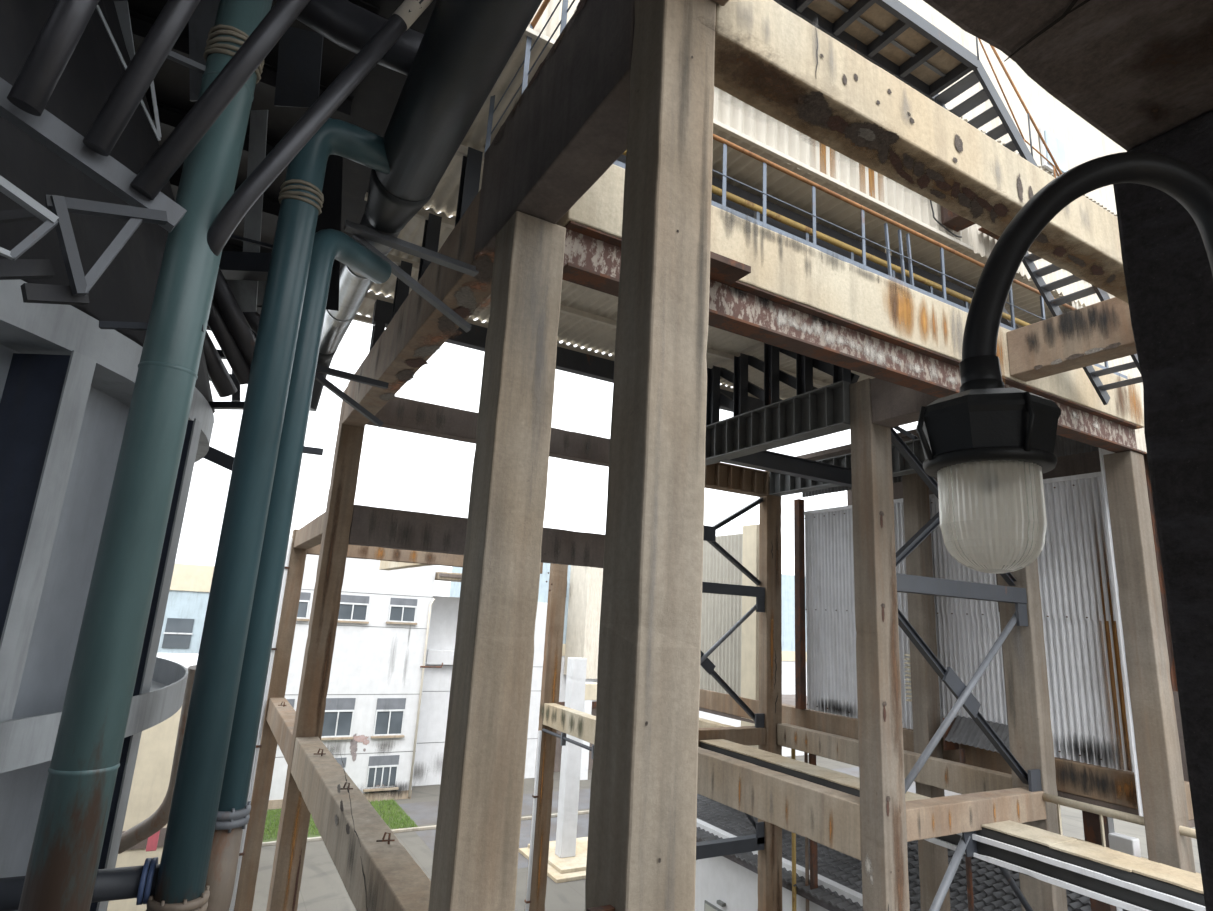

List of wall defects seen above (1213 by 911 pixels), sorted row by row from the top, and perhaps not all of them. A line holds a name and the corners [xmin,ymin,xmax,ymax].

spalling [1017,173,1034,202]
corrosion [731,287,769,306]
corrosion [890,290,947,339]
water stain [1027,308,1114,348]
crack [340,753,367,908]